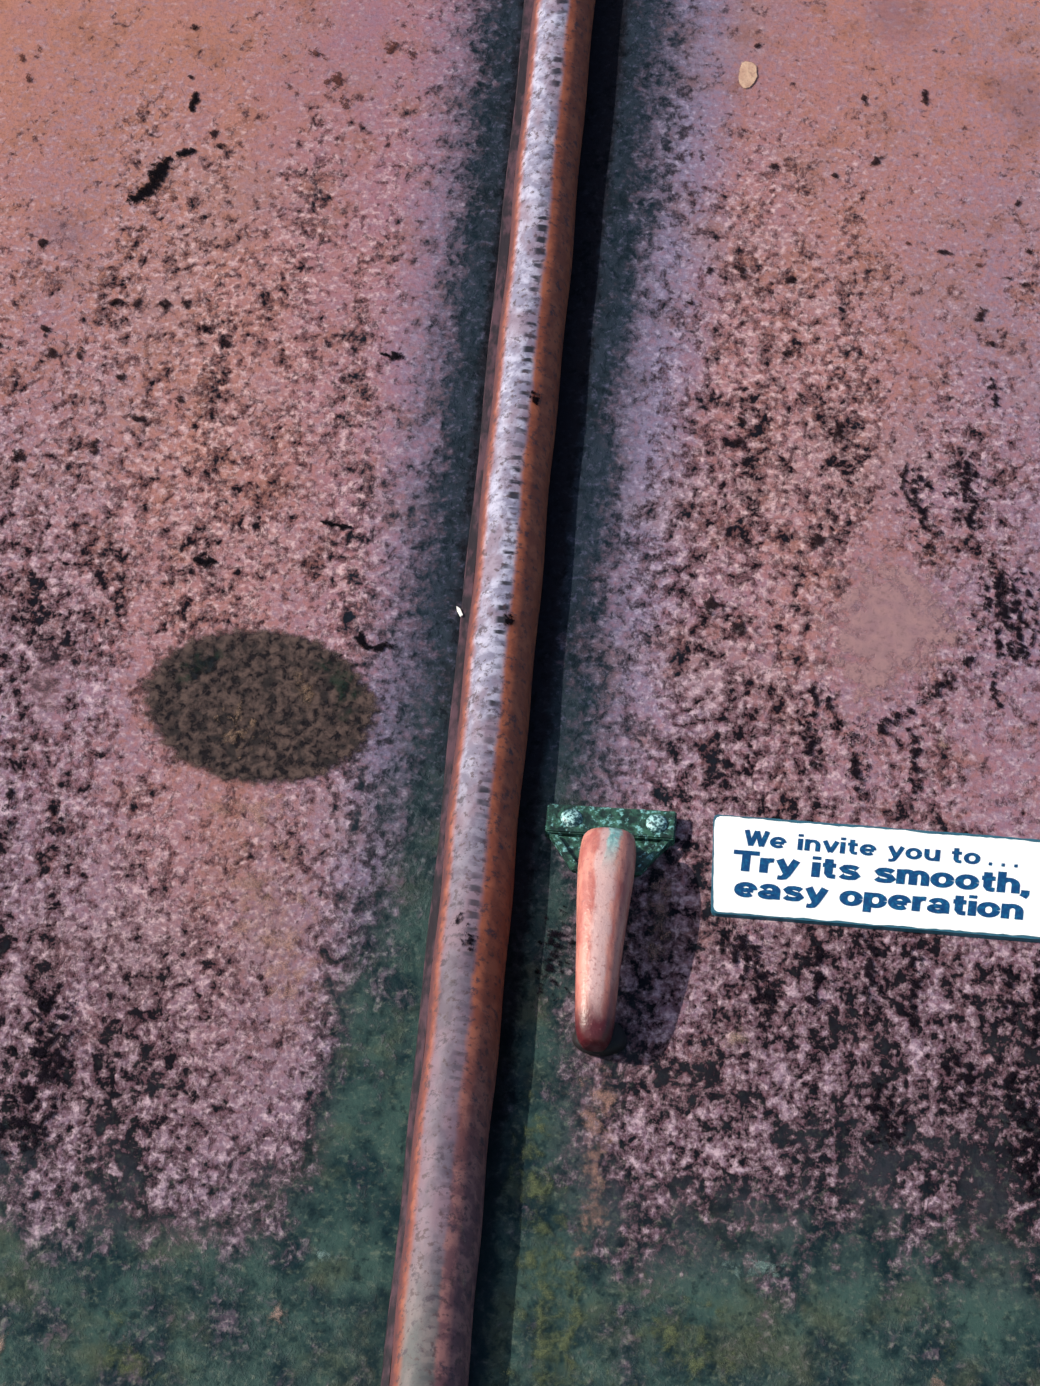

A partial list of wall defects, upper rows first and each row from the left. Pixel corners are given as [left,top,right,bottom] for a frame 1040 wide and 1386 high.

rust [110,296,190,311]
rust [40,325,58,362]
rust [733,412,747,447]
rust [11,449,26,462]
rust [803,530,827,551]
rust [694,593,751,635]
leakage [354,626,398,652]
leakage [142,628,379,785]
leakage [999,949,1040,1046]
leakage [0,970,82,1169]
leakage [846,1078,913,1148]
leakage [937,1049,1040,1205]